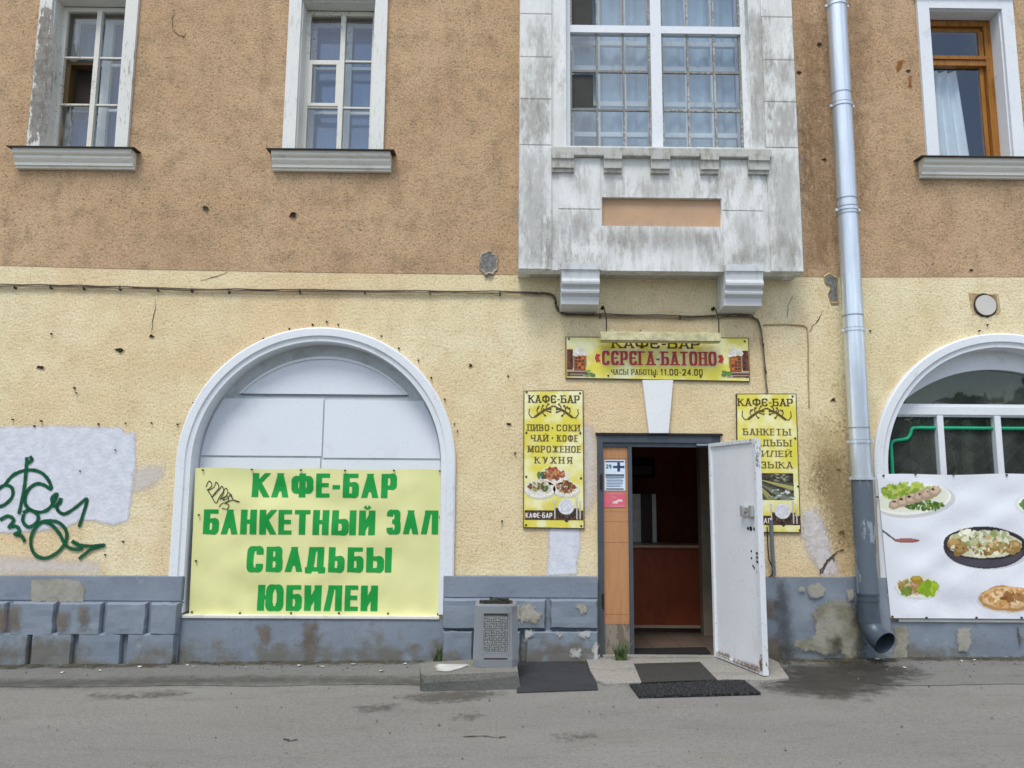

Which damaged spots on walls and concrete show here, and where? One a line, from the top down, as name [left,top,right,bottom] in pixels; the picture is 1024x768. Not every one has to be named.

peeling [26,7,56,145]
flaking render [824,272,839,305]
peeling [768,507,864,659]
peeling [517,604,542,641]
peeling [569,631,600,660]
peeling [956,628,971,652]